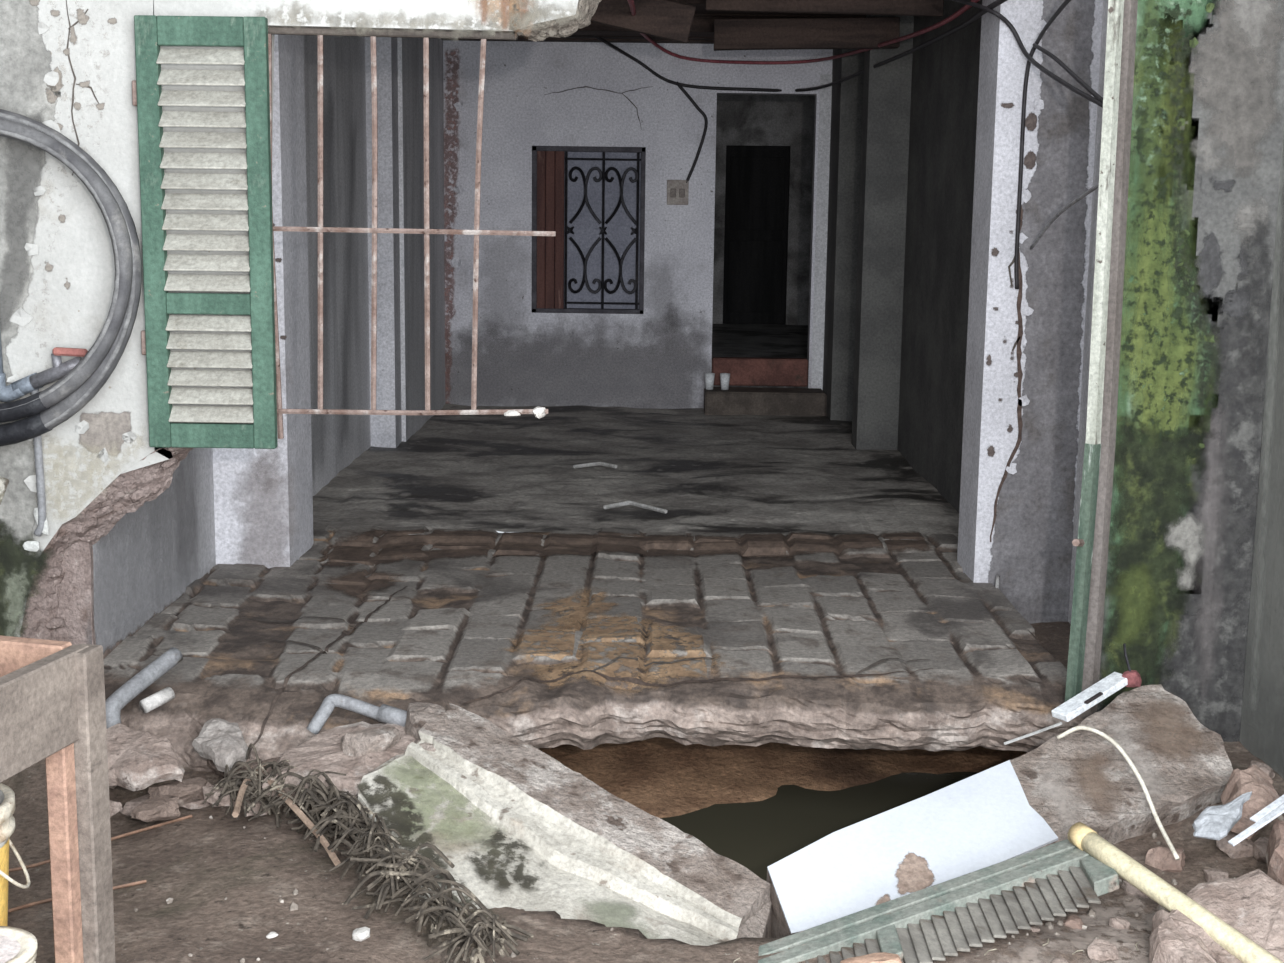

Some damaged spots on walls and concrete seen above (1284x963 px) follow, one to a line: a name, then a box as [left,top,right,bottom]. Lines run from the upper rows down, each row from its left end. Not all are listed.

peeling [0,0,105,133]
spalling [519,0,601,42]
peeling [0,136,53,404]
peeling [75,411,137,462]
peeling [444,50,464,404]
peeling [988,0,1095,624]
damp [1151,0,1284,742]
peeling [1211,178,1235,192]
peeling [1195,233,1253,319]
spalling [0,438,193,645]
peeling [1167,515,1203,589]